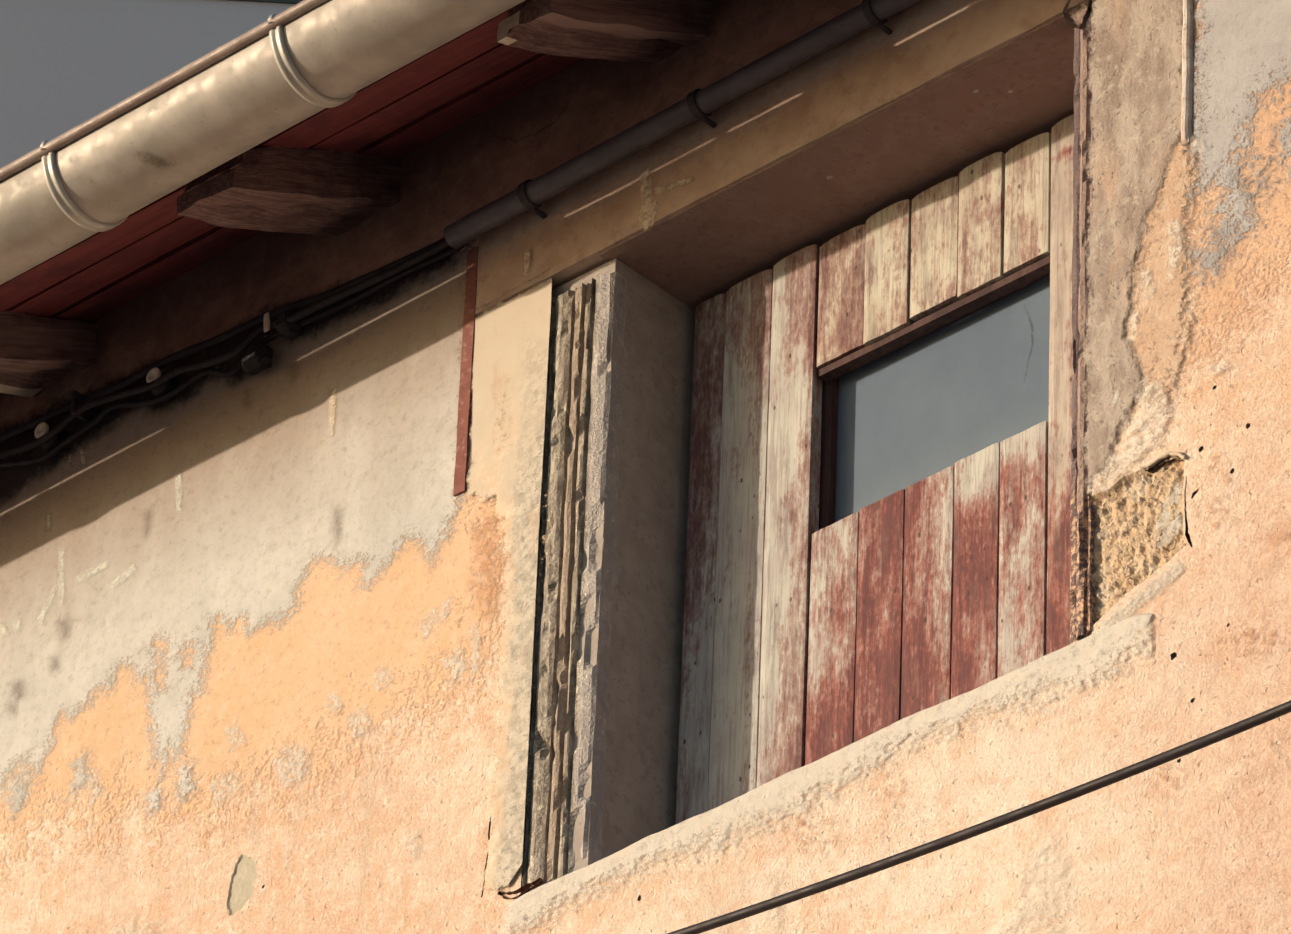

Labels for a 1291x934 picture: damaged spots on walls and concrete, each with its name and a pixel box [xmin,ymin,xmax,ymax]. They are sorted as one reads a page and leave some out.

peeling [0,240,511,881]
peeling [1087,0,1291,632]
spalling [227,854,265,916]